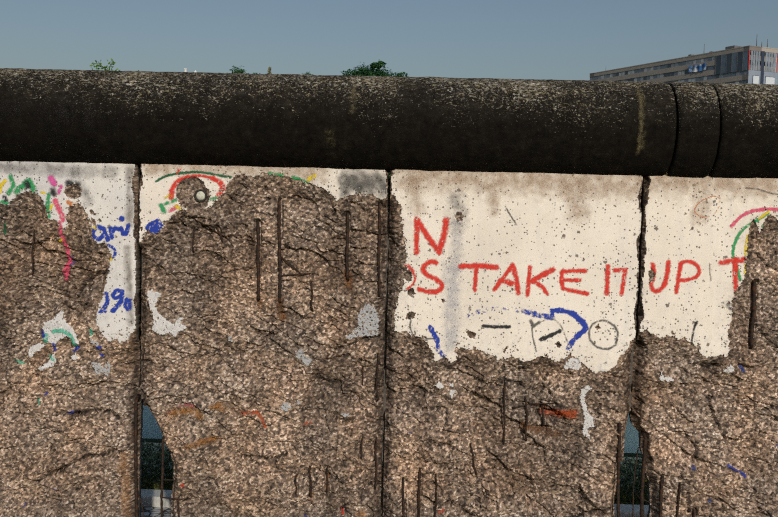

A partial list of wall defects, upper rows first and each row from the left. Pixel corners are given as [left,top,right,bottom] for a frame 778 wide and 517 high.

spalling [0,164,778,517]